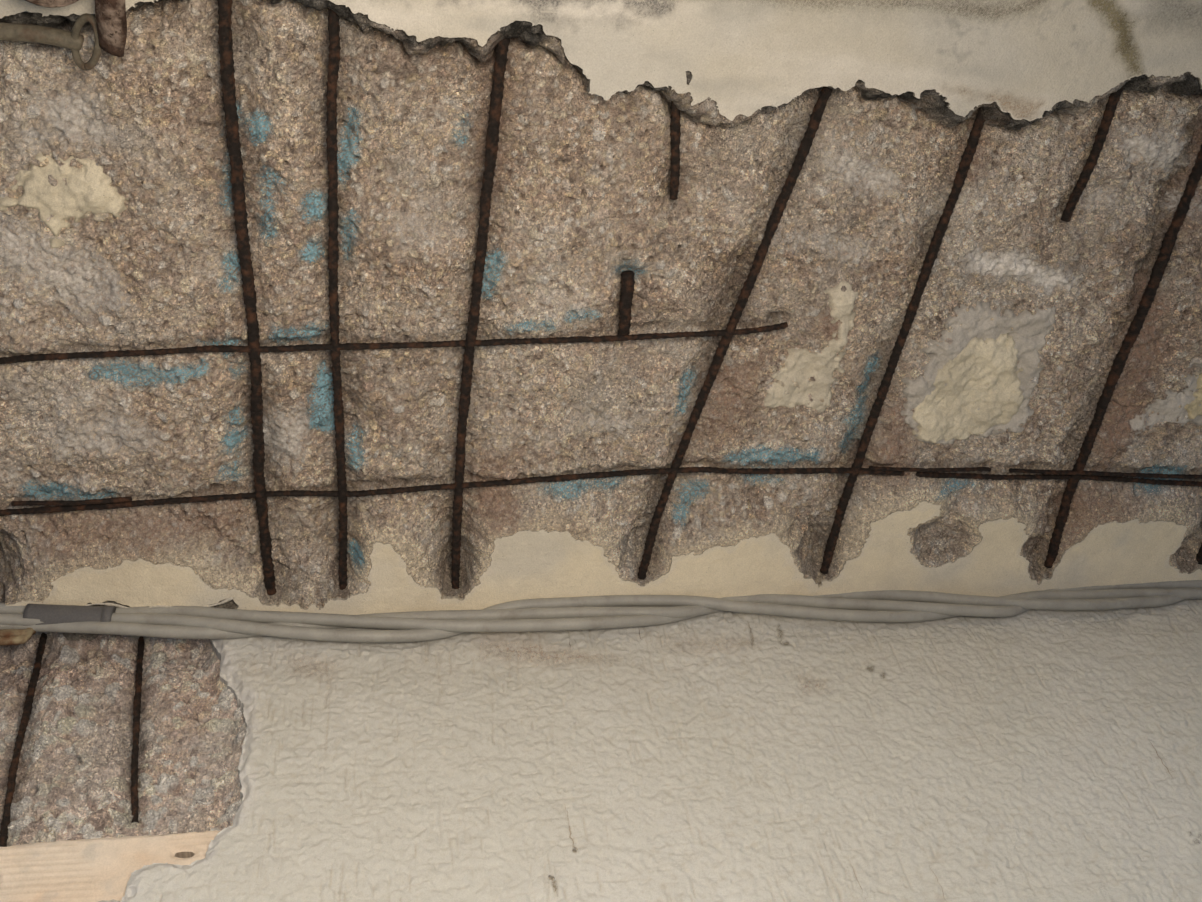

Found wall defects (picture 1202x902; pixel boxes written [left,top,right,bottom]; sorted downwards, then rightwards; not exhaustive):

corrosion [0,0,1202,595]
spalling [0,0,1202,609]
corrosion [0,633,47,847]
spalling [0,632,246,847]
corrosion [131,636,145,823]